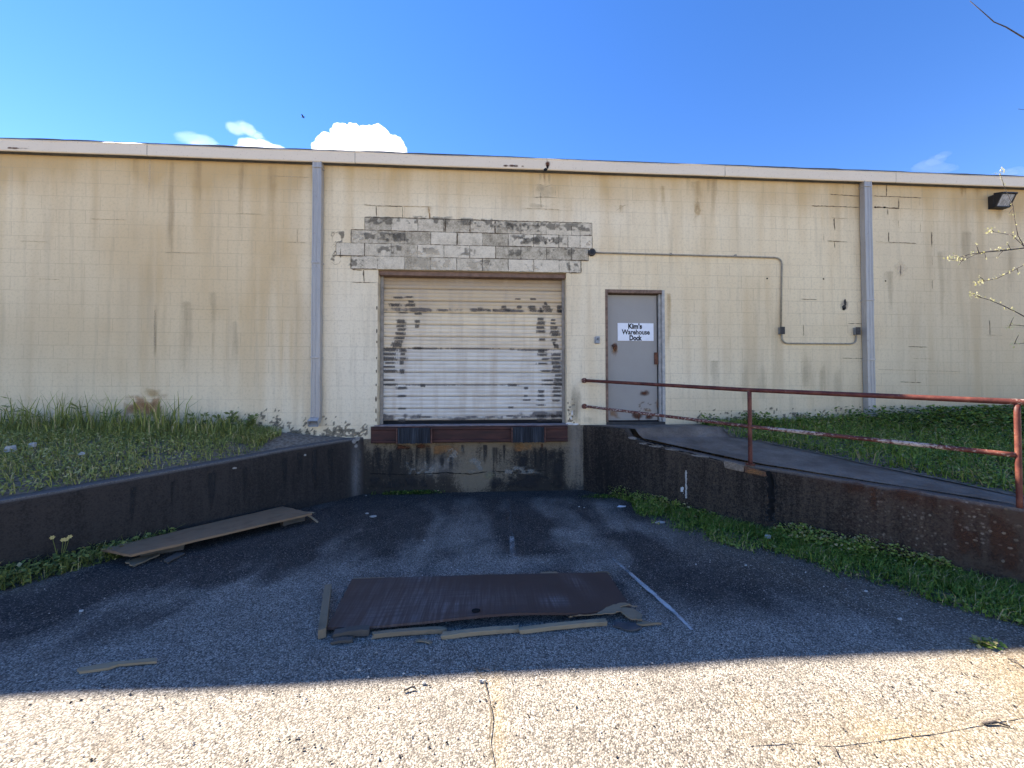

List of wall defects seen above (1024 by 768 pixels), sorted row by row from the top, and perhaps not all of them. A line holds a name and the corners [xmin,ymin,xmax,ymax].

peeling [331,217,593,273]
crack [813,185,933,274]
water stain [471,445,563,488]
crack [458,642,494,763]
crack [749,713,1024,764]